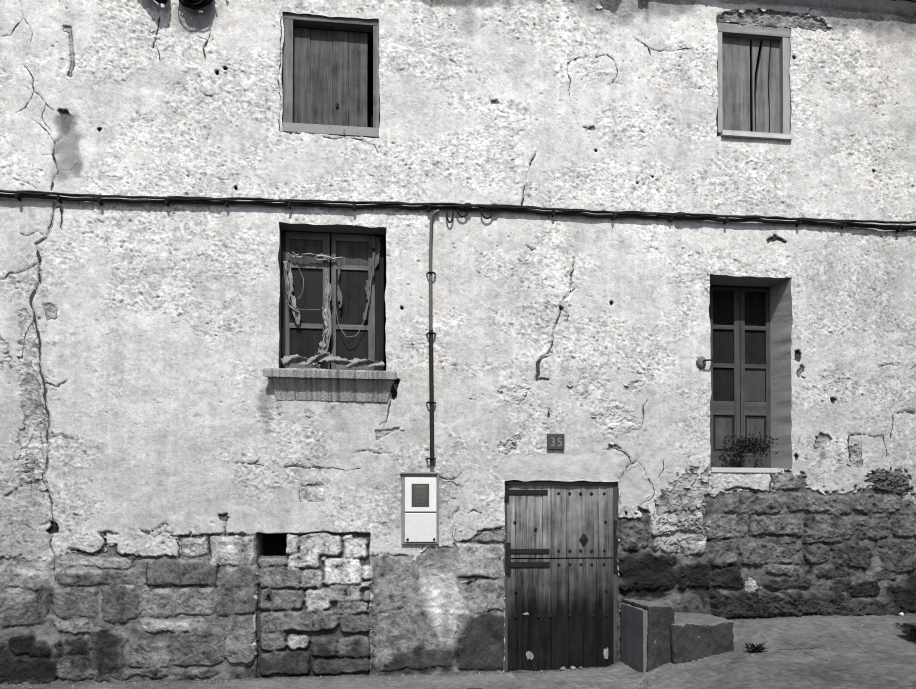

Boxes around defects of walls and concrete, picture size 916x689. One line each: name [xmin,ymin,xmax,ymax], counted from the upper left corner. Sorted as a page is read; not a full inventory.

crack [149,17,160,59]
spalling [716,7,832,32]
crack [567,54,621,95]
water stain [55,115,82,178]
crack [0,66,245,590]
crack [523,259,575,400]
crack [612,447,664,526]
spalling [654,467,713,557]
crack [675,475,773,503]
flaking render [847,445,916,507]